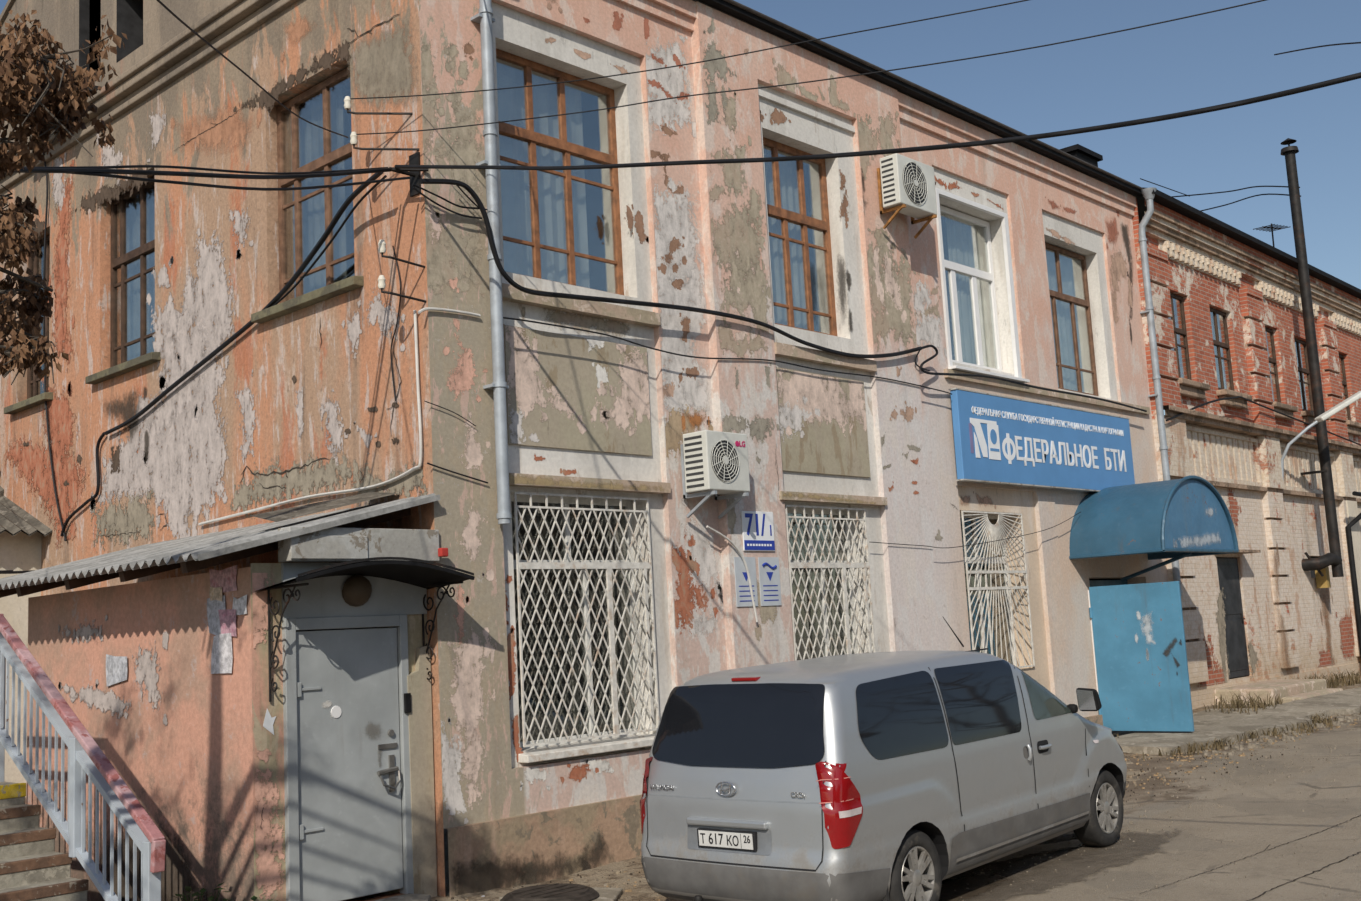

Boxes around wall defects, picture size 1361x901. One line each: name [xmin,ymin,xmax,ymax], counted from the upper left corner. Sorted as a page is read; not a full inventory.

peeling [770,57,901,180]
peeling [623,204,649,244]
peeling [657,18,791,389]
peeling [839,170,849,228]
peeling [146,256,200,423]
peeling [546,309,629,367]
peeling [867,228,947,377]
peeling [663,367,821,464]
peeling [671,530,724,640]
peeling [58,630,169,726]
peeling [481,569,523,762]
leakage [99,827,223,901]